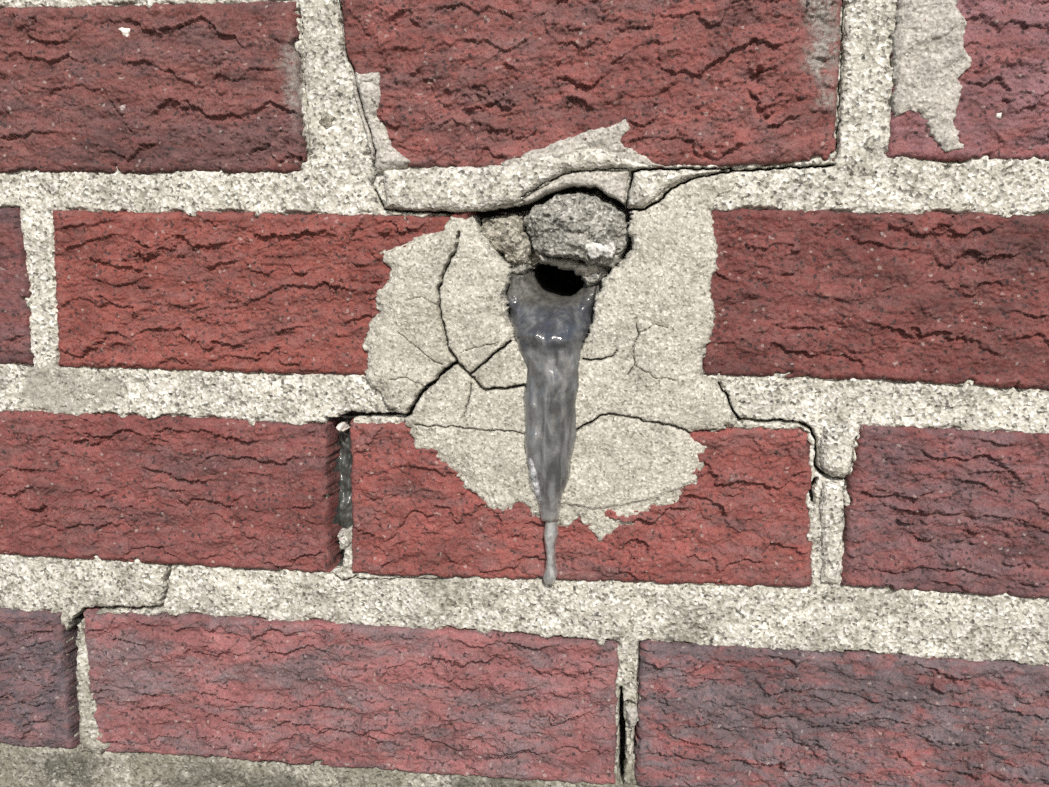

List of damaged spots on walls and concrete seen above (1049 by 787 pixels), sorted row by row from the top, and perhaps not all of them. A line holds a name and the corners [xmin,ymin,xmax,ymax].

crack [342,0,843,418]
peeling [628,170,730,208]
peeling [410,341,527,427]
damp [528,459,540,495]
peeling [557,487,683,542]
crack [718,382,845,503]
crack [74,607,89,624]
crack [619,654,639,776]